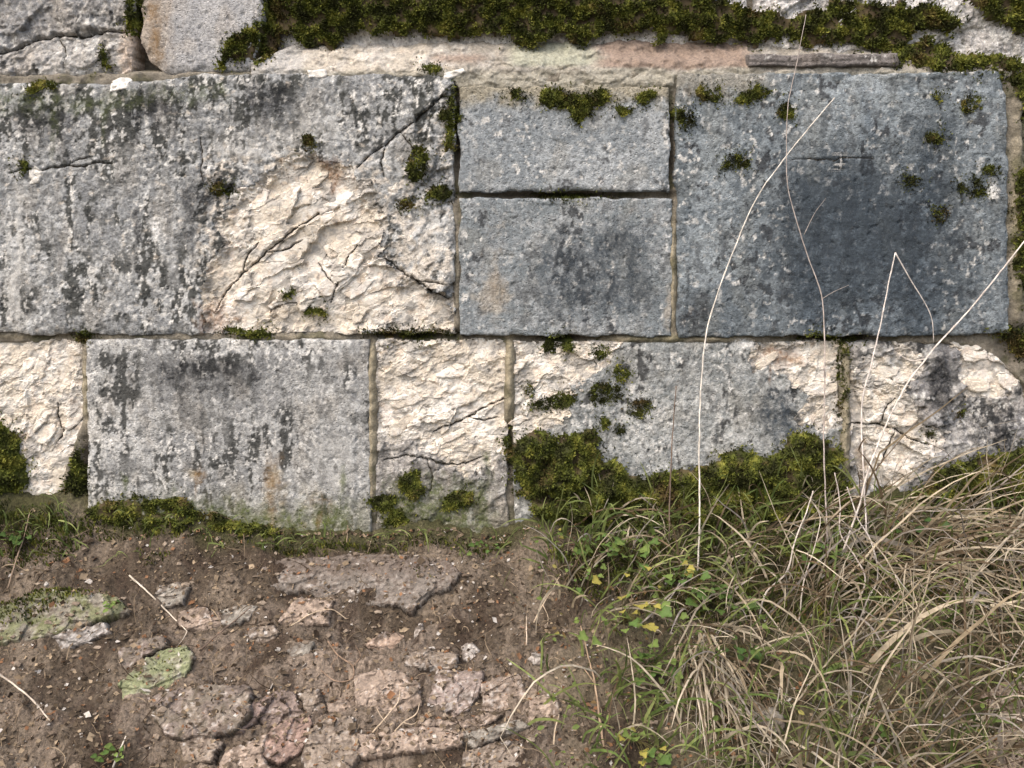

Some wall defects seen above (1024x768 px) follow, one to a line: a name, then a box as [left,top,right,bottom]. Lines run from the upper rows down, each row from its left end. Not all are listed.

crack [12,157,112,173]
crack [217,213,320,310]
crack [318,246,357,300]
crack [435,398,507,431]
crack [848,398,929,470]
crack [384,454,482,492]